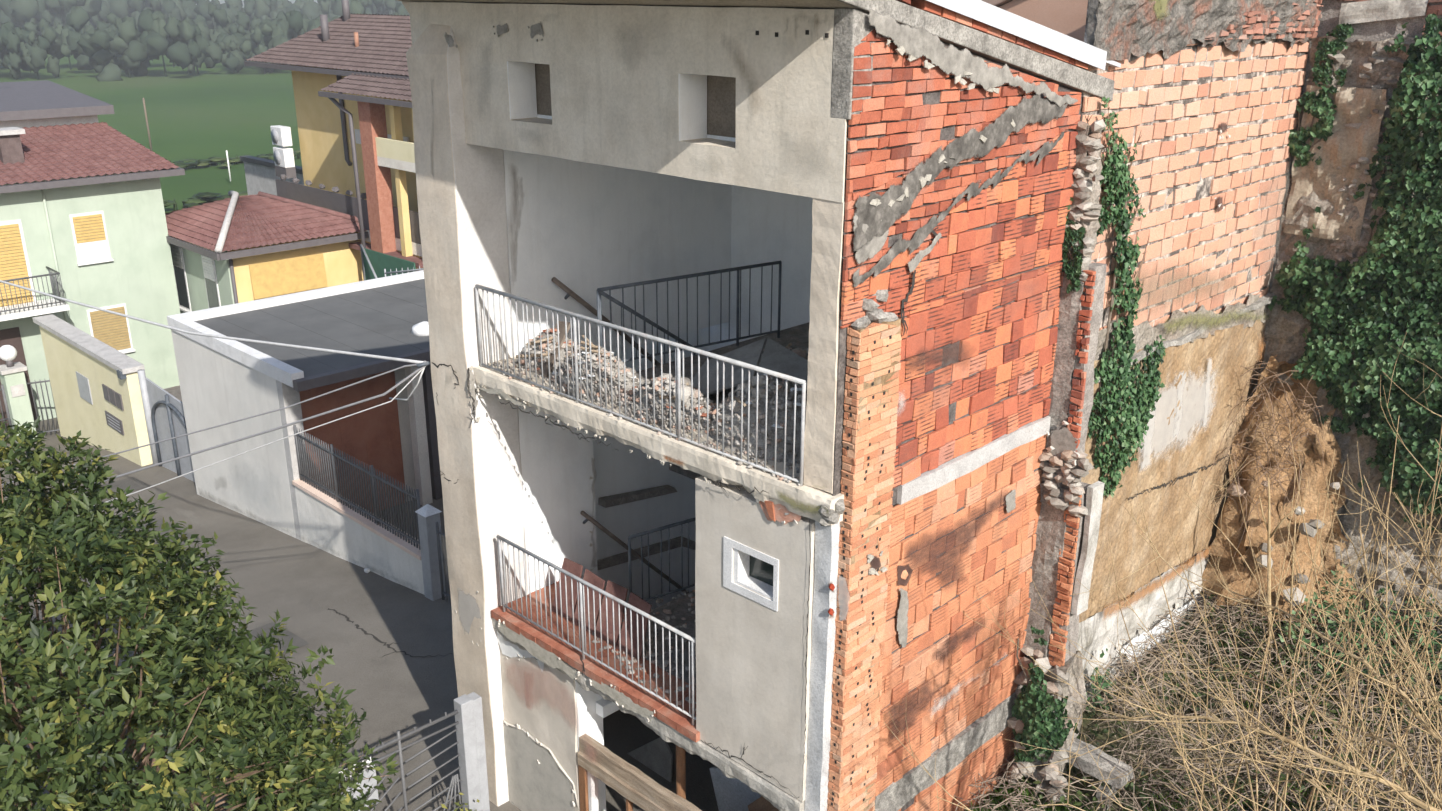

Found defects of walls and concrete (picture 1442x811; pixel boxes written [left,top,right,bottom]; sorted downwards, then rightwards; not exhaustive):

spalling [869,9,1078,107]
peeling [870,154,951,207]
flaking render [756,499,801,525]
crack [327,608,452,657]
spalling [455,591,655,722]